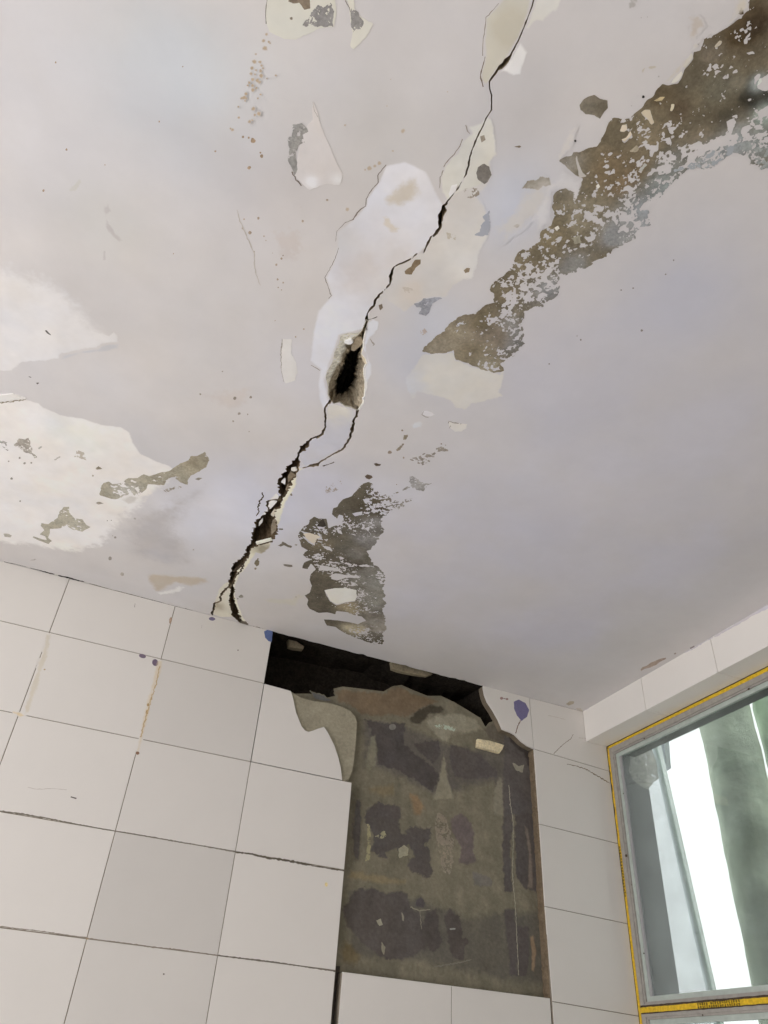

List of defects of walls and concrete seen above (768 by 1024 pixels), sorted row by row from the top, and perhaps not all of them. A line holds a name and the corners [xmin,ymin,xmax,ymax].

peeling [288,102,343,190]
peeling [265,0,373,49]
crack [365,0,534,323]
peeling [299,0,768,465]
water stain [641,0,750,83]
peeling [0,393,209,560]
crack [89,388,359,622]
peeling [264,463,492,726]